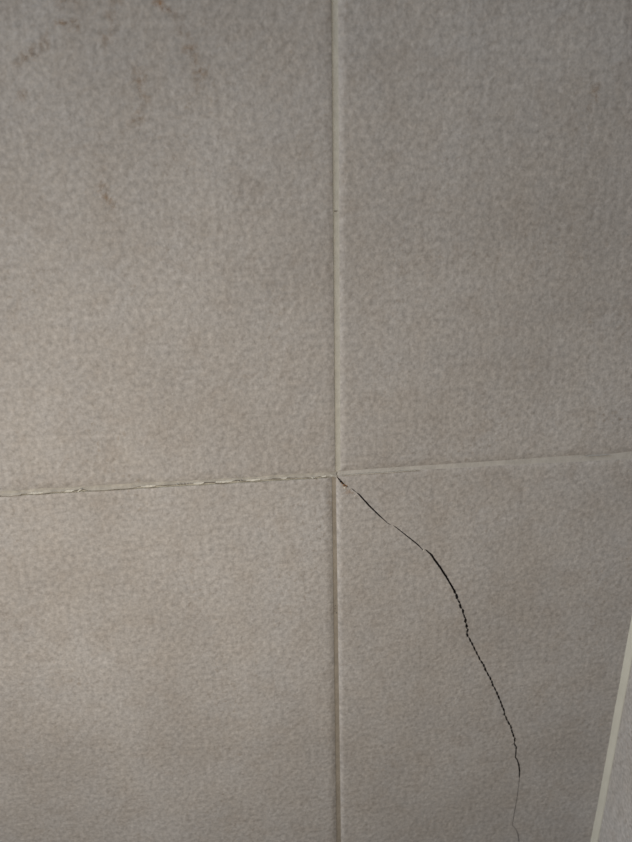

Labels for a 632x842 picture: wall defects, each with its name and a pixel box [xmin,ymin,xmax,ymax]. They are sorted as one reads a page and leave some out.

crack [337,477,520,840]